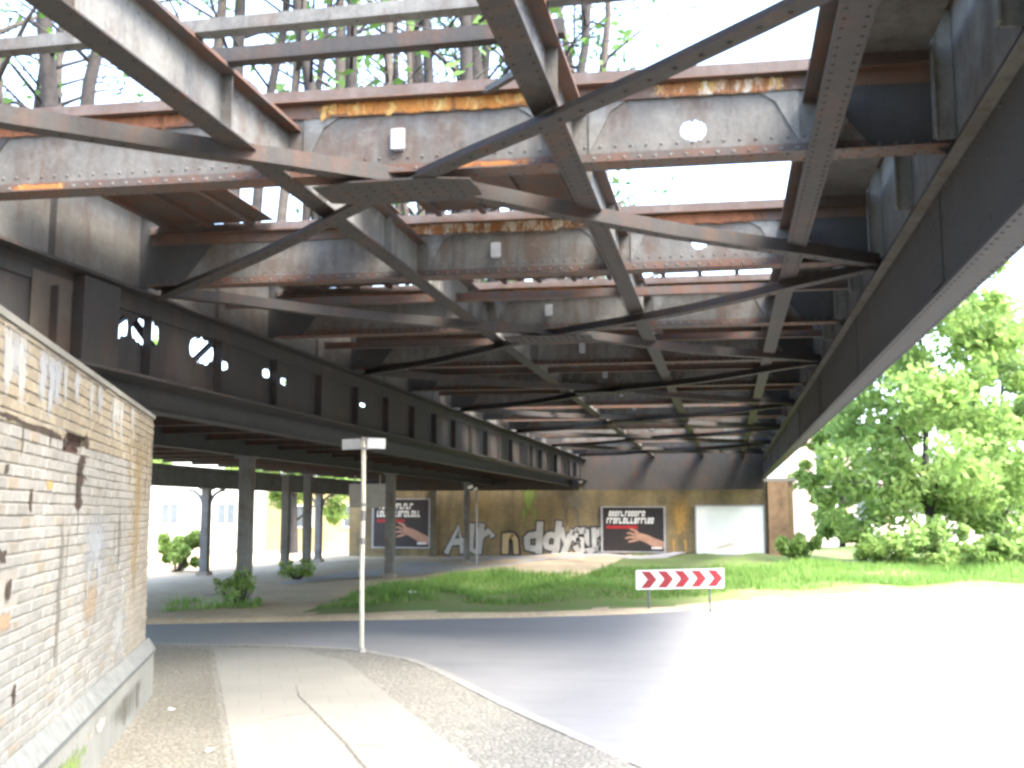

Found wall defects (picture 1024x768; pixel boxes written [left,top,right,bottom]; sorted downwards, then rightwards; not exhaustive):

rust [648,75,789,98]
rust [317,92,527,120]
rust [461,159,523,167]
rust [14,183,62,197]
rust [410,219,582,235]
damp [4,331,26,394]
damp [40,354,134,442]